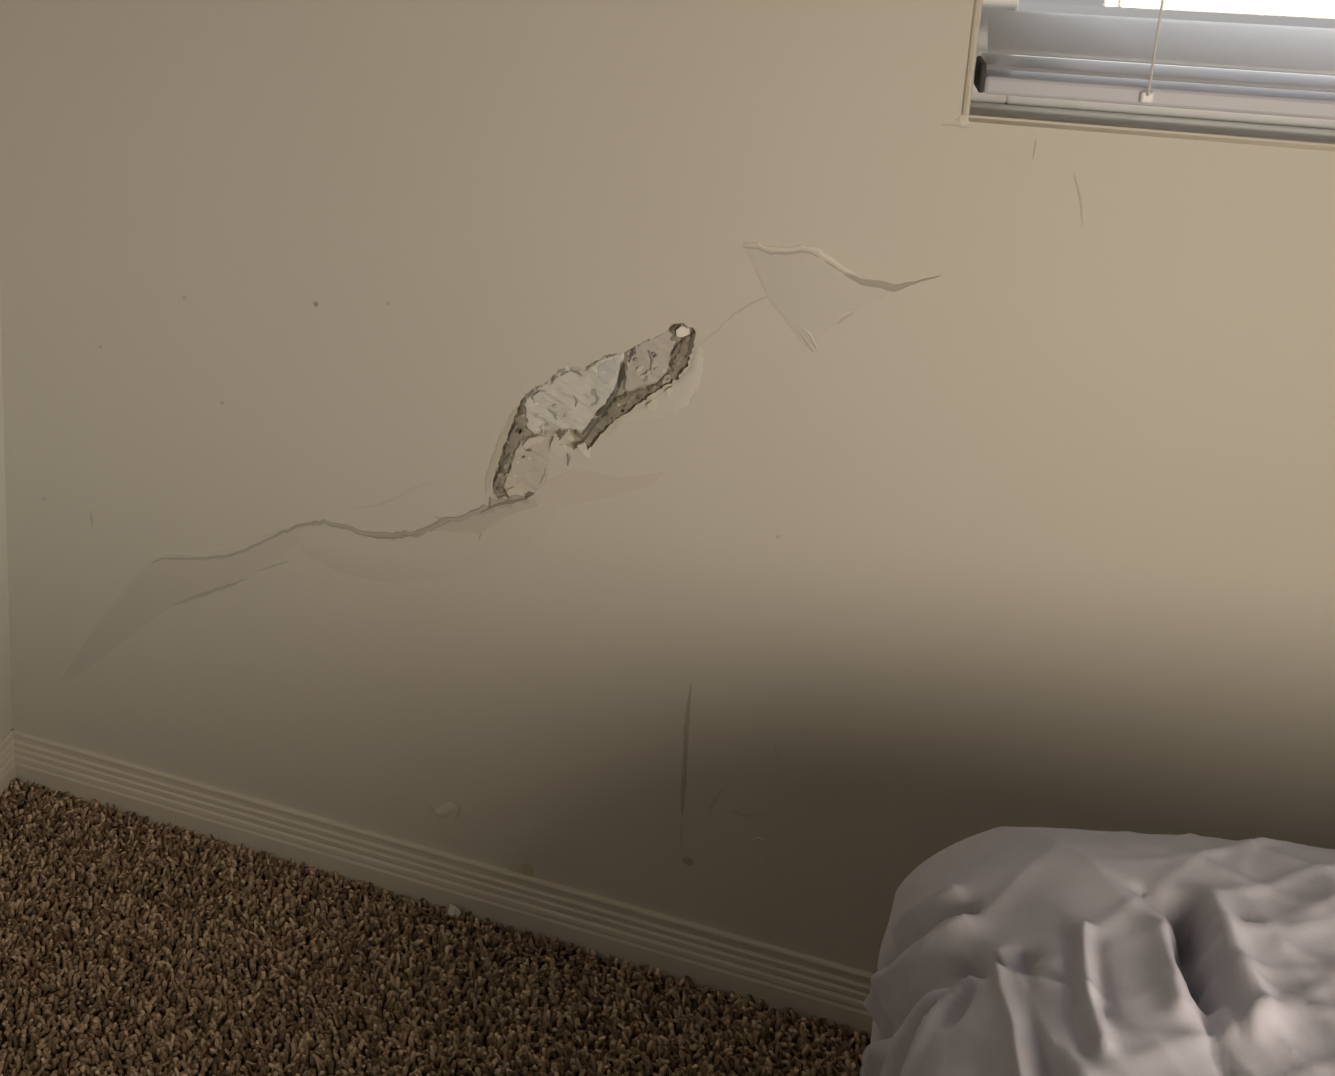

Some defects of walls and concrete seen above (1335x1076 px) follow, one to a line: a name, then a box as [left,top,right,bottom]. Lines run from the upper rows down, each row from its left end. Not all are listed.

crack [743,247,940,324]
flaking render [493,323,696,497]
crack [151,495,529,606]
crack [681,686,691,815]